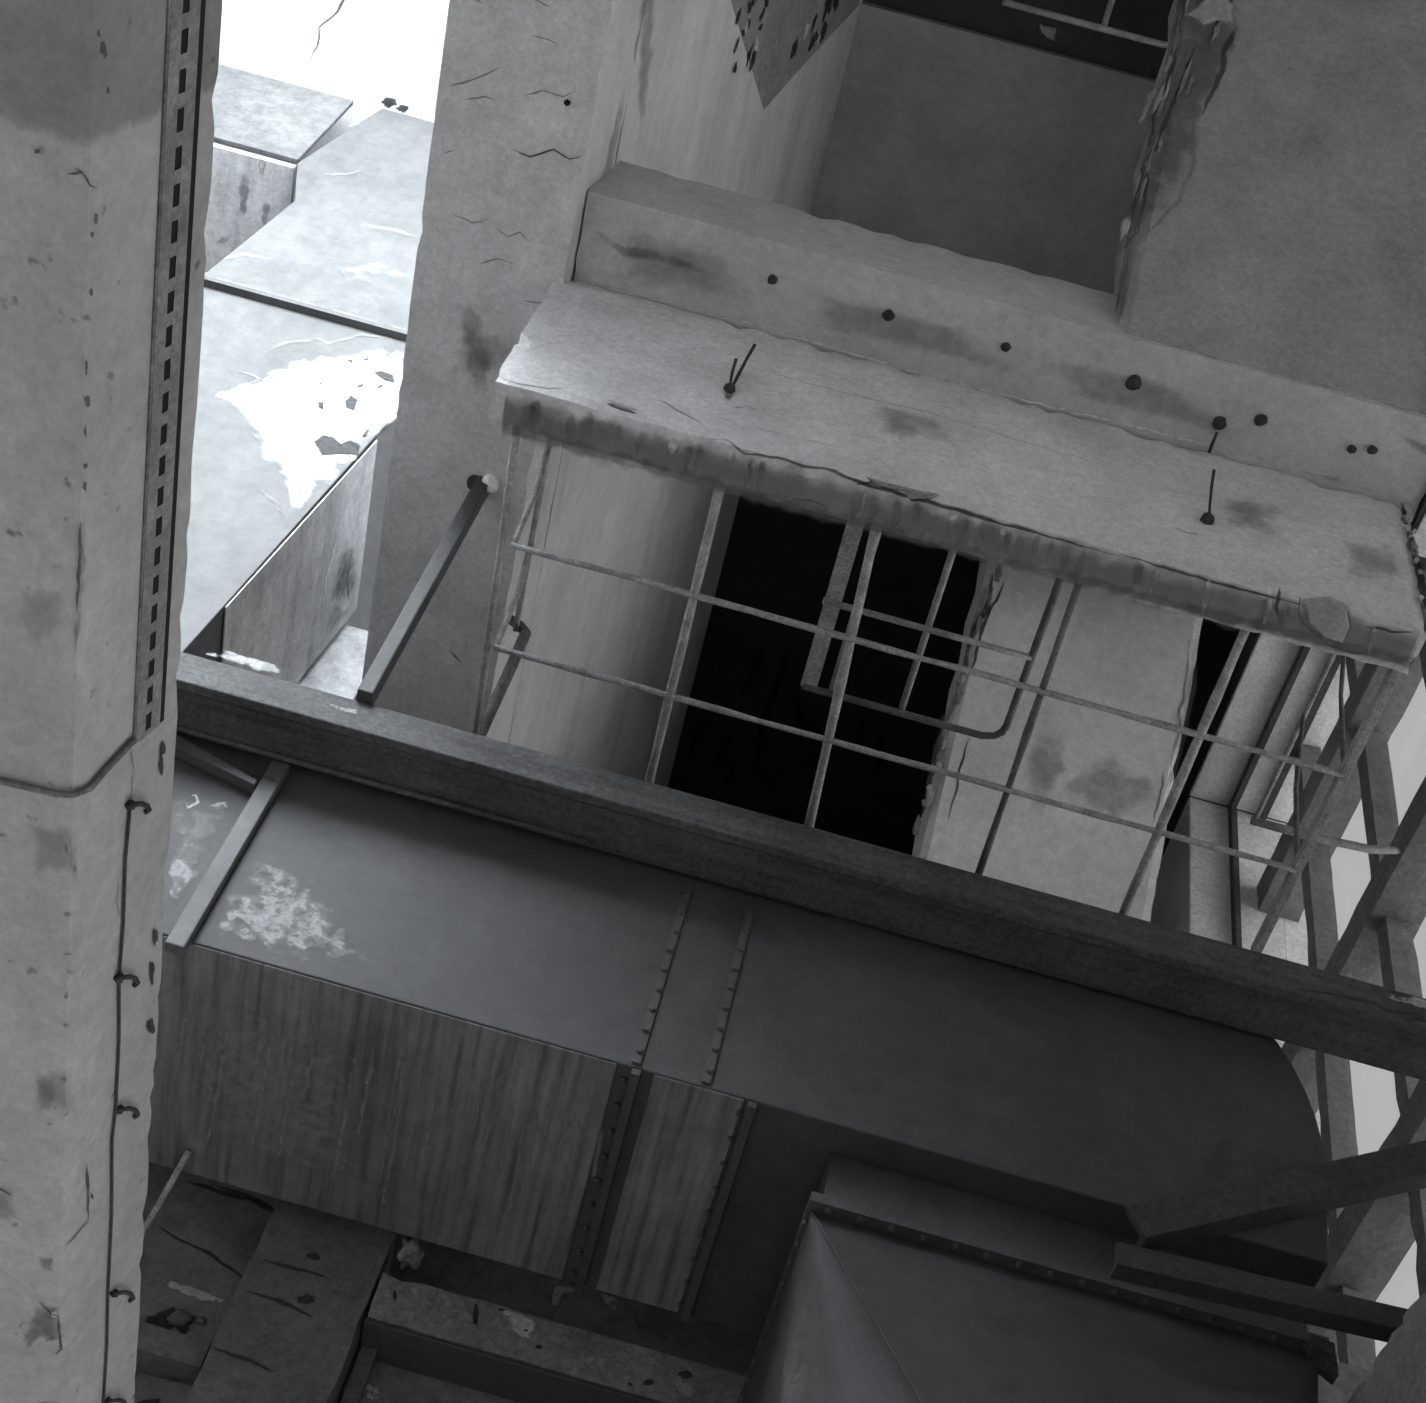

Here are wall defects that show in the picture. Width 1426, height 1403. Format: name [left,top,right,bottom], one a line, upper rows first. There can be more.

crack [305,0,345,72]
peeling [731,0,860,109]
spalling [1116,0,1235,311]
peeling [218,333,403,517]
spalling [912,565,1004,835]
peeling [19,1302,67,1354]